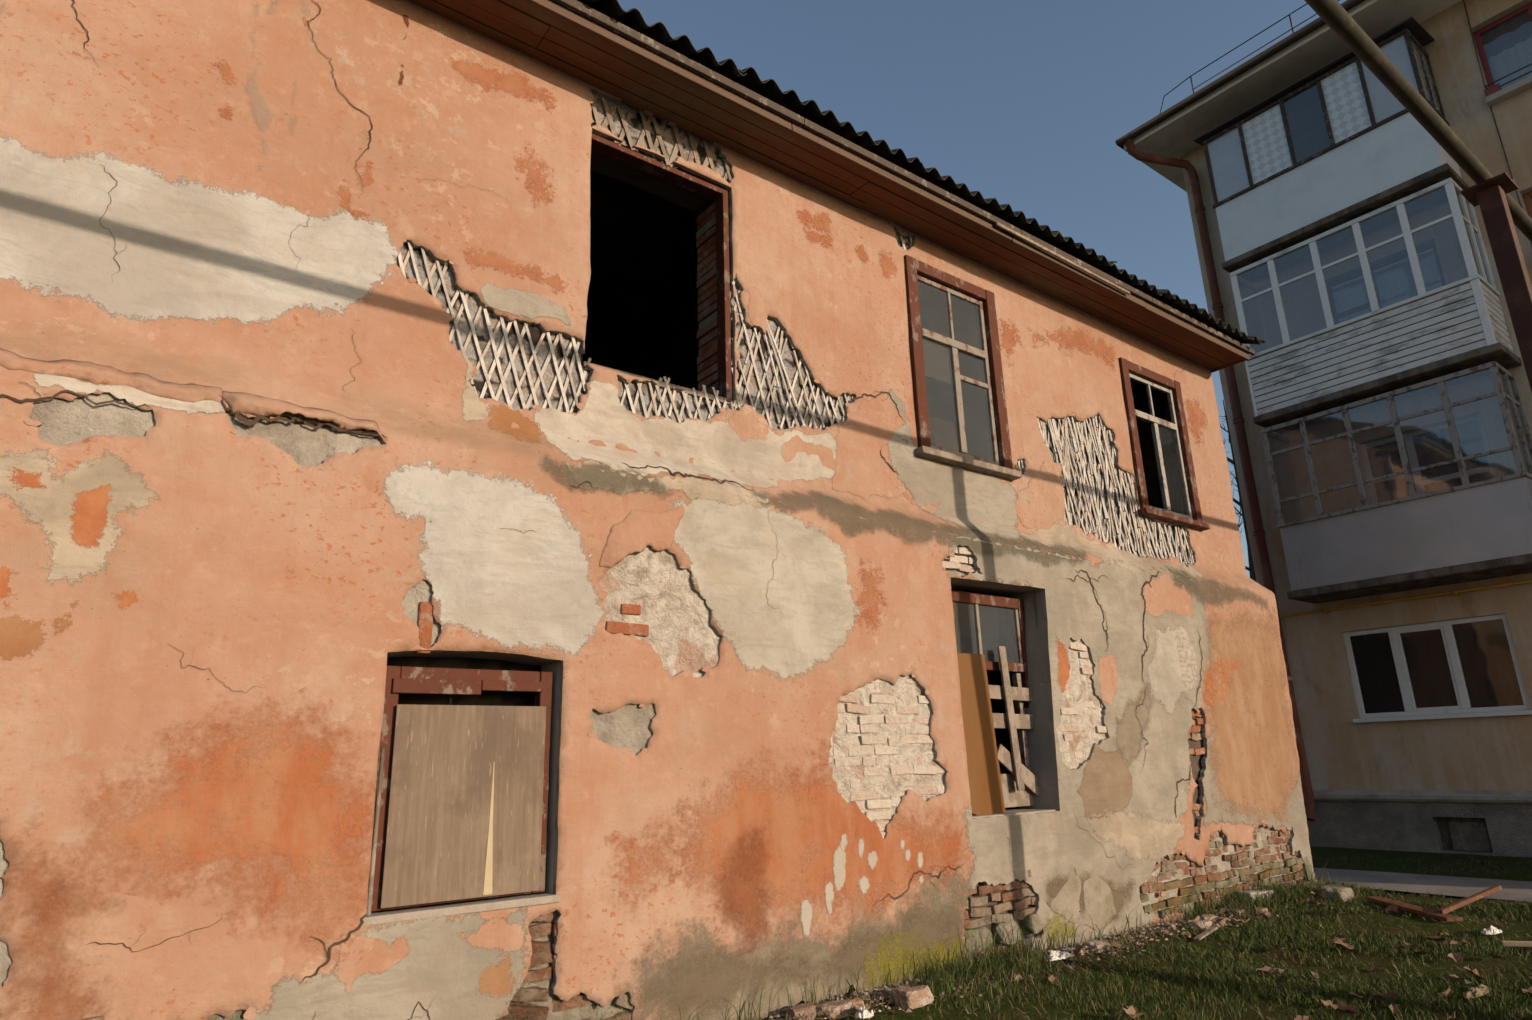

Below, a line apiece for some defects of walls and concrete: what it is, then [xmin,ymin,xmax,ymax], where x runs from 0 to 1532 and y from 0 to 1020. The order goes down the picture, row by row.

crack [71,0,109,66]
crack [307,0,373,198]
peeling [396,242,939,515]
peeling [0,373,383,660]
peeling [402,580,440,655]
peeling [587,704,656,755]
peeling [597,546,720,677]
peeling [827,674,950,838]
crack [1068,570,1159,766]
peeling [1015,412,1317,919]
crack [1175,769,1191,818]
peeling [206,1007,256,1020]